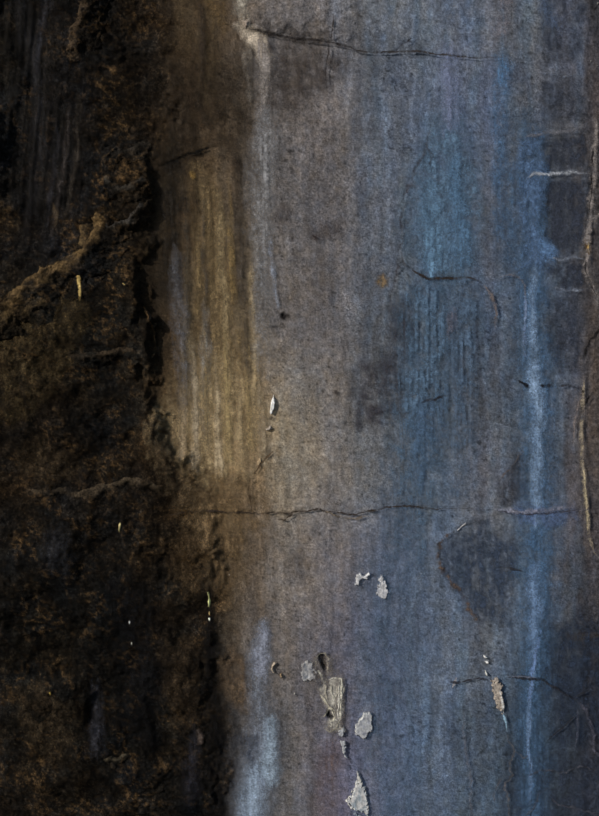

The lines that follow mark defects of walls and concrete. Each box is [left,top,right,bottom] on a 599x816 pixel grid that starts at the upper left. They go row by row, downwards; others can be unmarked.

crack [252,18,494,82]
leakage [0,0,242,314]
leakage [355,53,479,578]
crack [394,266,526,319]
leakage [0,160,234,816]
crack [171,451,453,521]
leakage [509,135,599,744]
peeling [354,572,390,599]
leakage [253,622,268,697]
peeling [301,653,373,758]
leakage [239,706,276,816]
peeling [345,771,369,816]